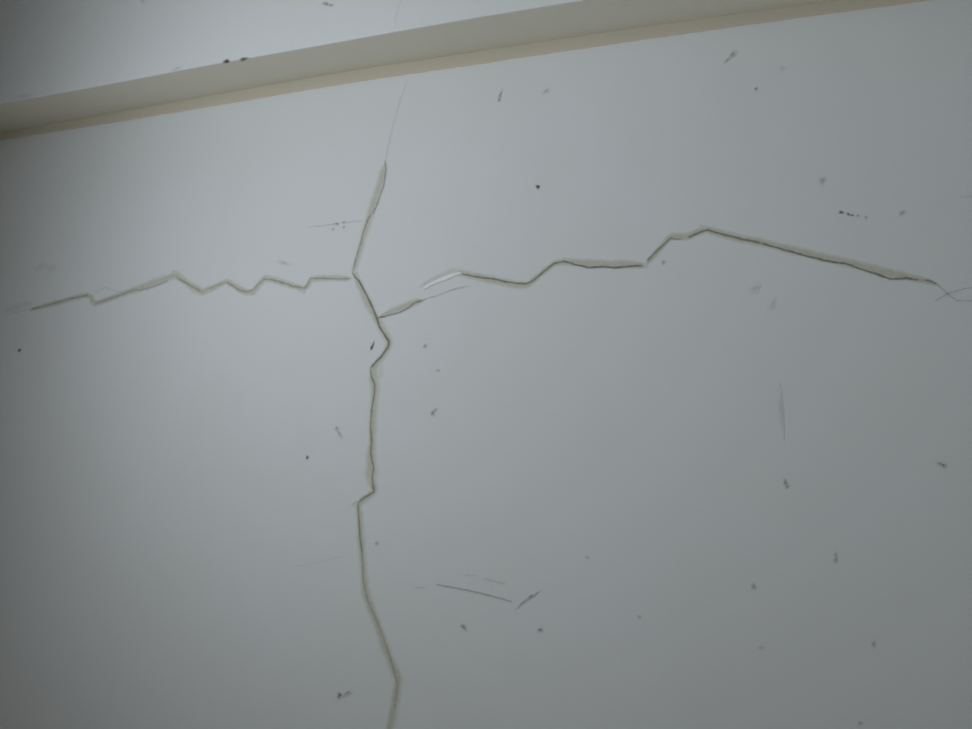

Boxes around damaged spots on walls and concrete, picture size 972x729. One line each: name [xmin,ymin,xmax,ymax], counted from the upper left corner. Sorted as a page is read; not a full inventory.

crack [4,163,939,729]